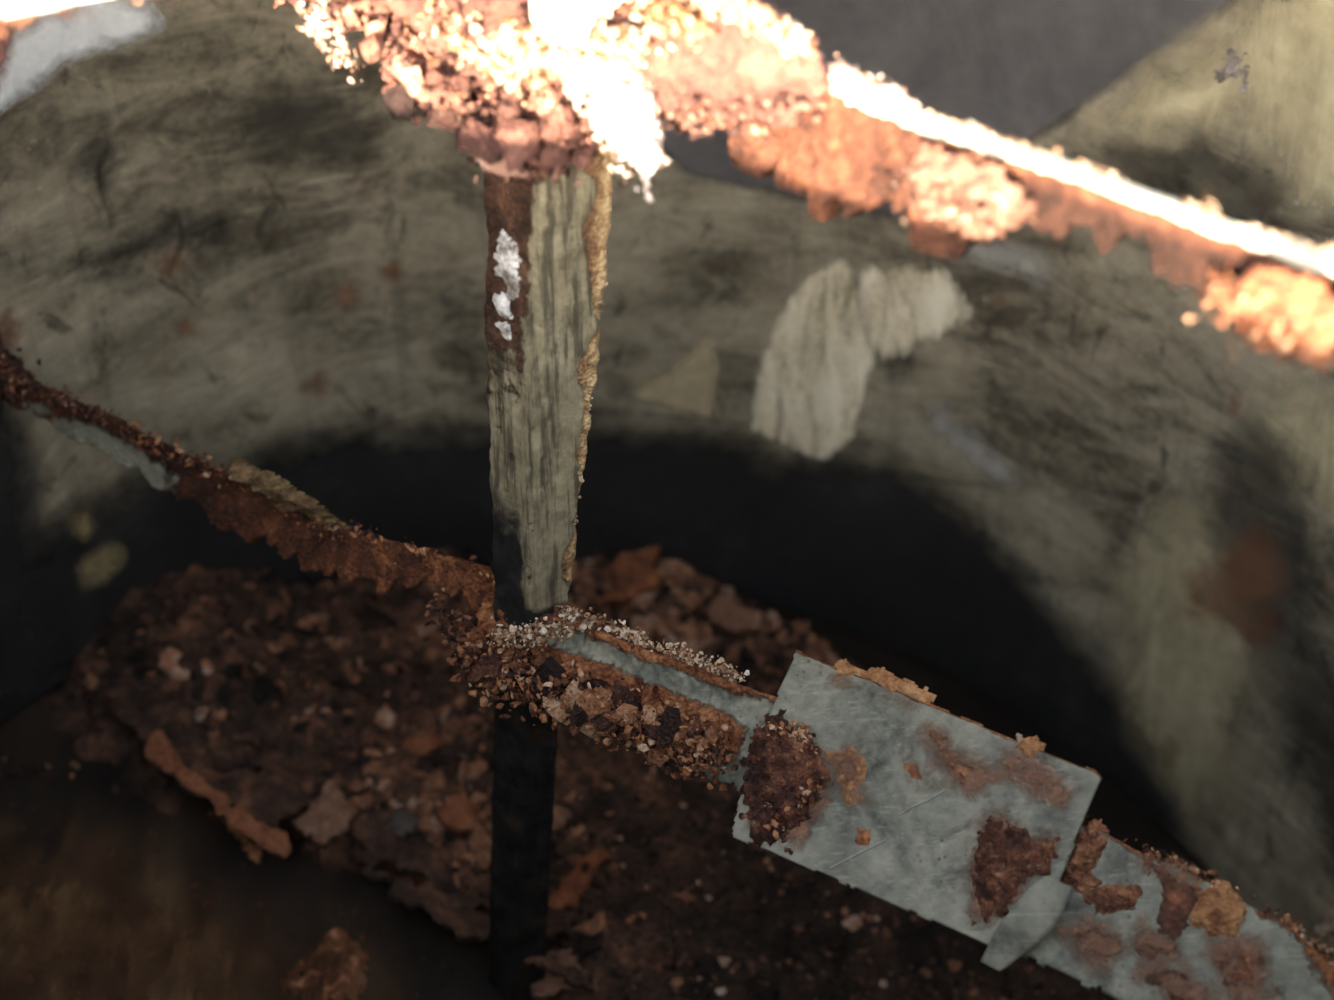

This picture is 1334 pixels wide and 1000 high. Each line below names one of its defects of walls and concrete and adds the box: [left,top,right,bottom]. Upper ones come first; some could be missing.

corrosion [0,17,12,72]
corrosion [876,164,1023,238]
corrosion [1185,265,1334,372]
corrosion [228,457,353,529]
corrosion [828,658,937,704]
corrosion [737,709,867,863]
corrosion [903,724,1072,808]
corrosion [855,827,871,846]
corrosion [967,813,1272,1000]